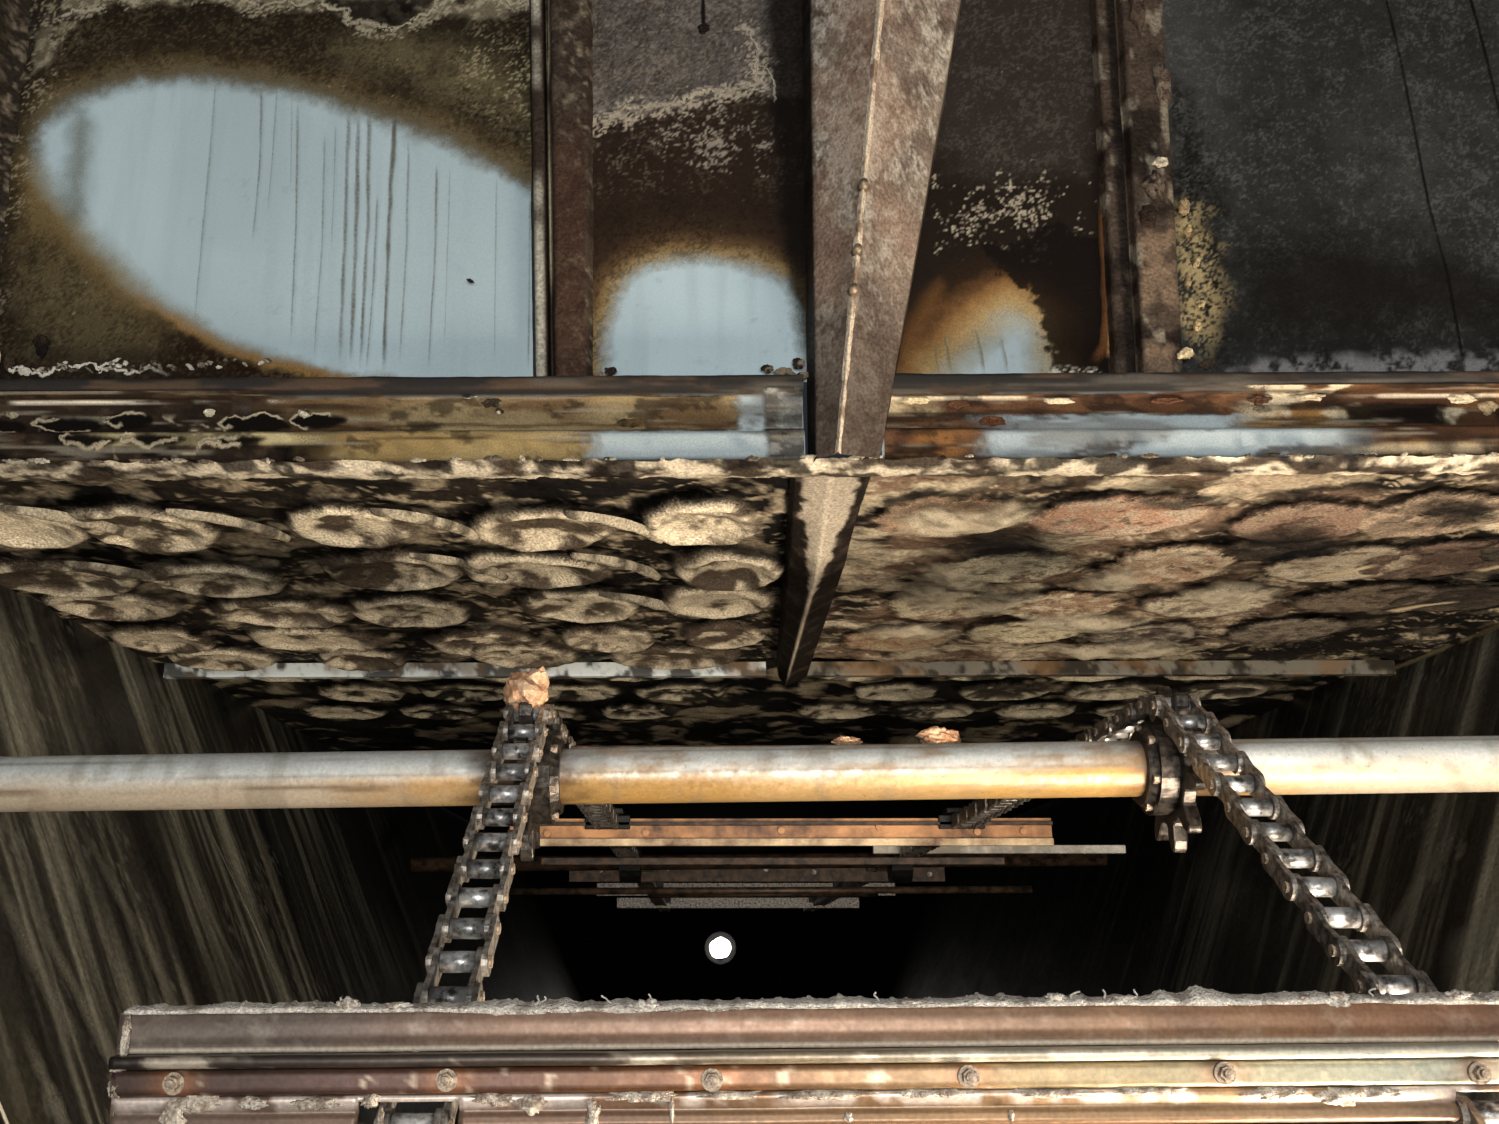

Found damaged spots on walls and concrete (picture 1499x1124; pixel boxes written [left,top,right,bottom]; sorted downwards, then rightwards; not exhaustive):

water stain [341,121,408,349]
peeling [899,397,1006,426]
peeling [1246,394,1273,406]
peeling [1296,393,1326,401]
peeling [1448,393,1499,416]